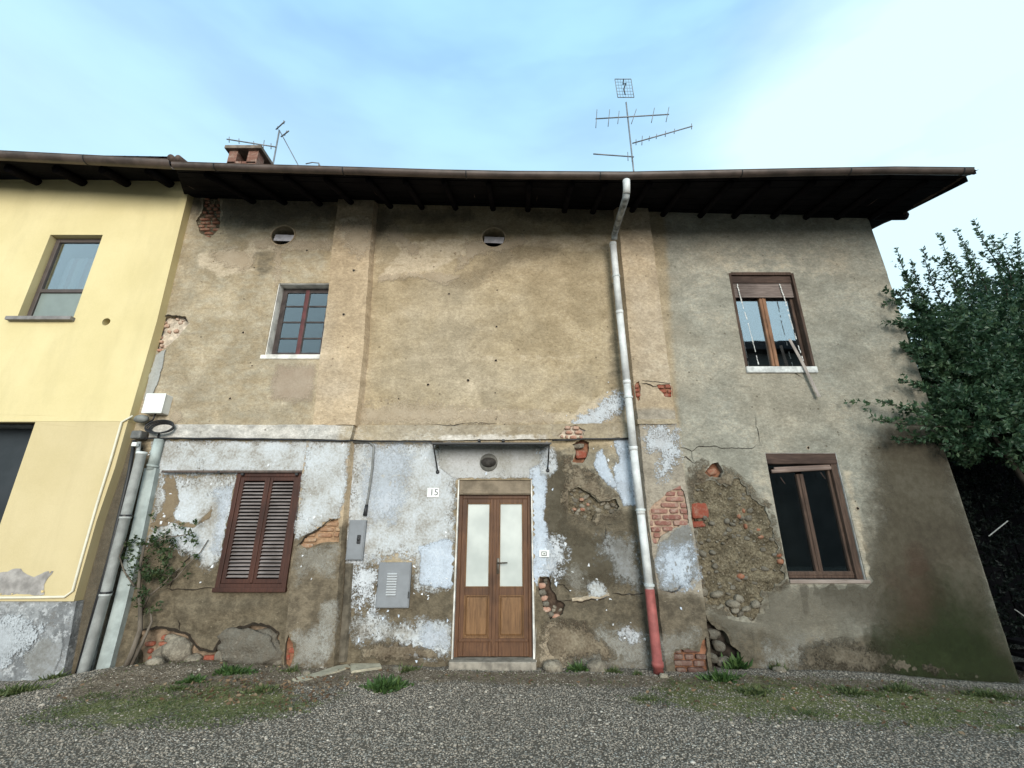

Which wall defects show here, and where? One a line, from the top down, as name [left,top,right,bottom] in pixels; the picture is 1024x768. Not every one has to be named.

flaking render [197,198,221,237]
flaking render [157,317,189,352]
flaking render [657,385,673,397]
crack [681,428,761,464]
peeling [141,415,789,672]
leakage [723,427,1015,681]
peeling [0,568,53,596]
peeling [0,614,62,680]